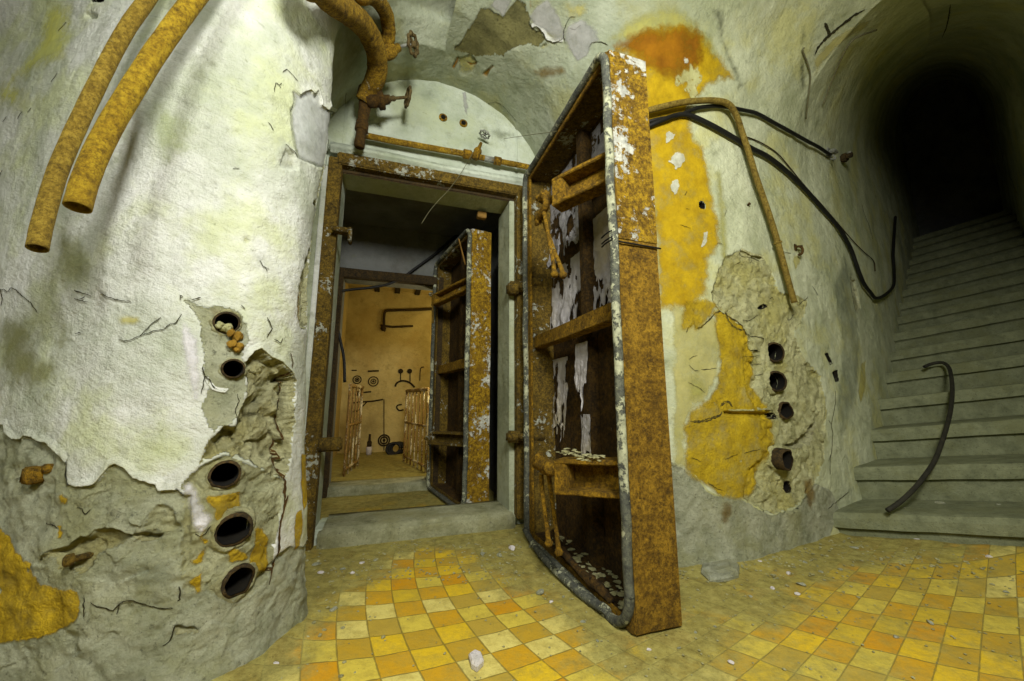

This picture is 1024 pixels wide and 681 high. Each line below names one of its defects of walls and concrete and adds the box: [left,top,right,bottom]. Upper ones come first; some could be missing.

peeling [454,0,598,60]
peeling [293,84,337,217]
corrosion [616,11,730,307]
crack [119,295,201,341]
flaking render [297,236,312,329]
flaking render [0,299,308,681]
crack [241,305,294,585]
flaking render [671,248,839,568]
crack [82,587,181,646]